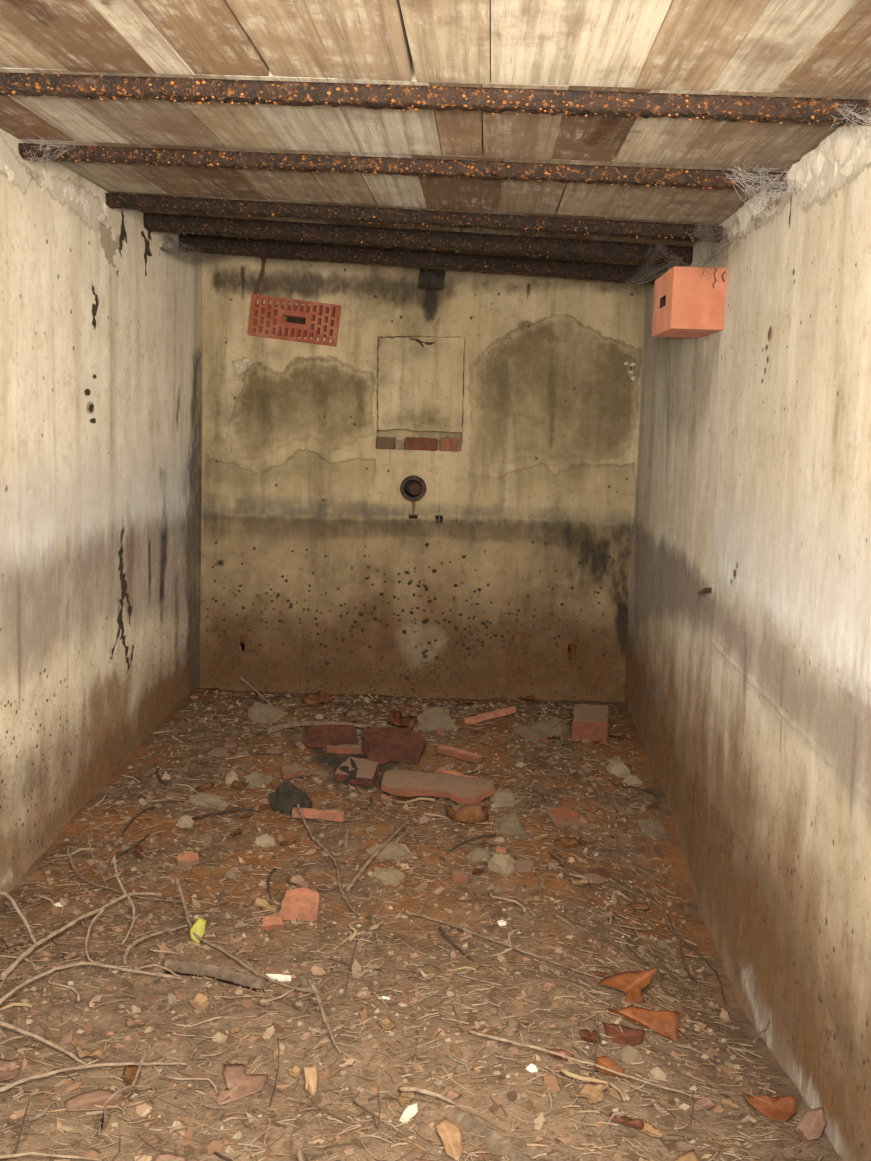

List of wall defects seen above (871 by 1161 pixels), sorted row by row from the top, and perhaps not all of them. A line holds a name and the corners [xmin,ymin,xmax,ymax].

water stain [245,366,367,408]
water stain [2,354,214,686]
crack [110,517,134,673]
water stain [71,582,200,810]
water stain [566,525,871,796]